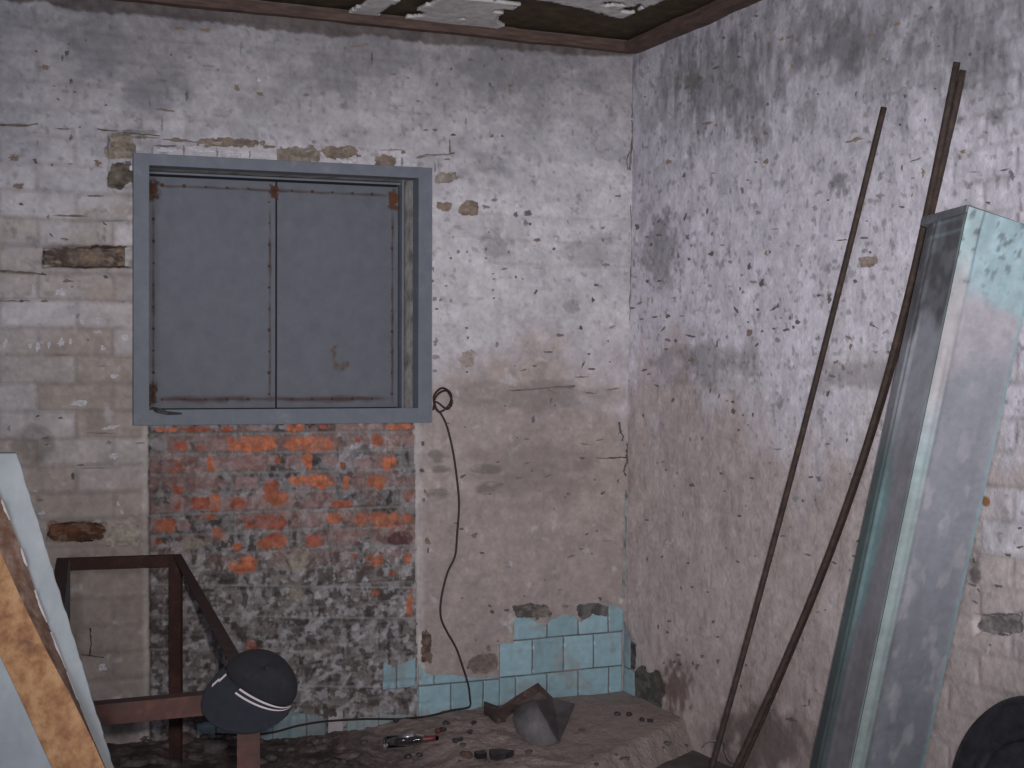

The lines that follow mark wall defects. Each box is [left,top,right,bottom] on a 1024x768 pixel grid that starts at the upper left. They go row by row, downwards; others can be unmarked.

peeling [348,0,400,16]
peeling [405,0,521,30]
peeling [537,0,664,19]
spalling [88,79,467,197]
spalling [437,198,497,216]
spalling [6,214,129,302]
spalling [33,490,106,543]
crack [596,422,628,598]
flaking render [136,423,433,732]
spalling [488,595,607,623]
spalling [968,555,1024,654]
spalling [466,626,506,674]